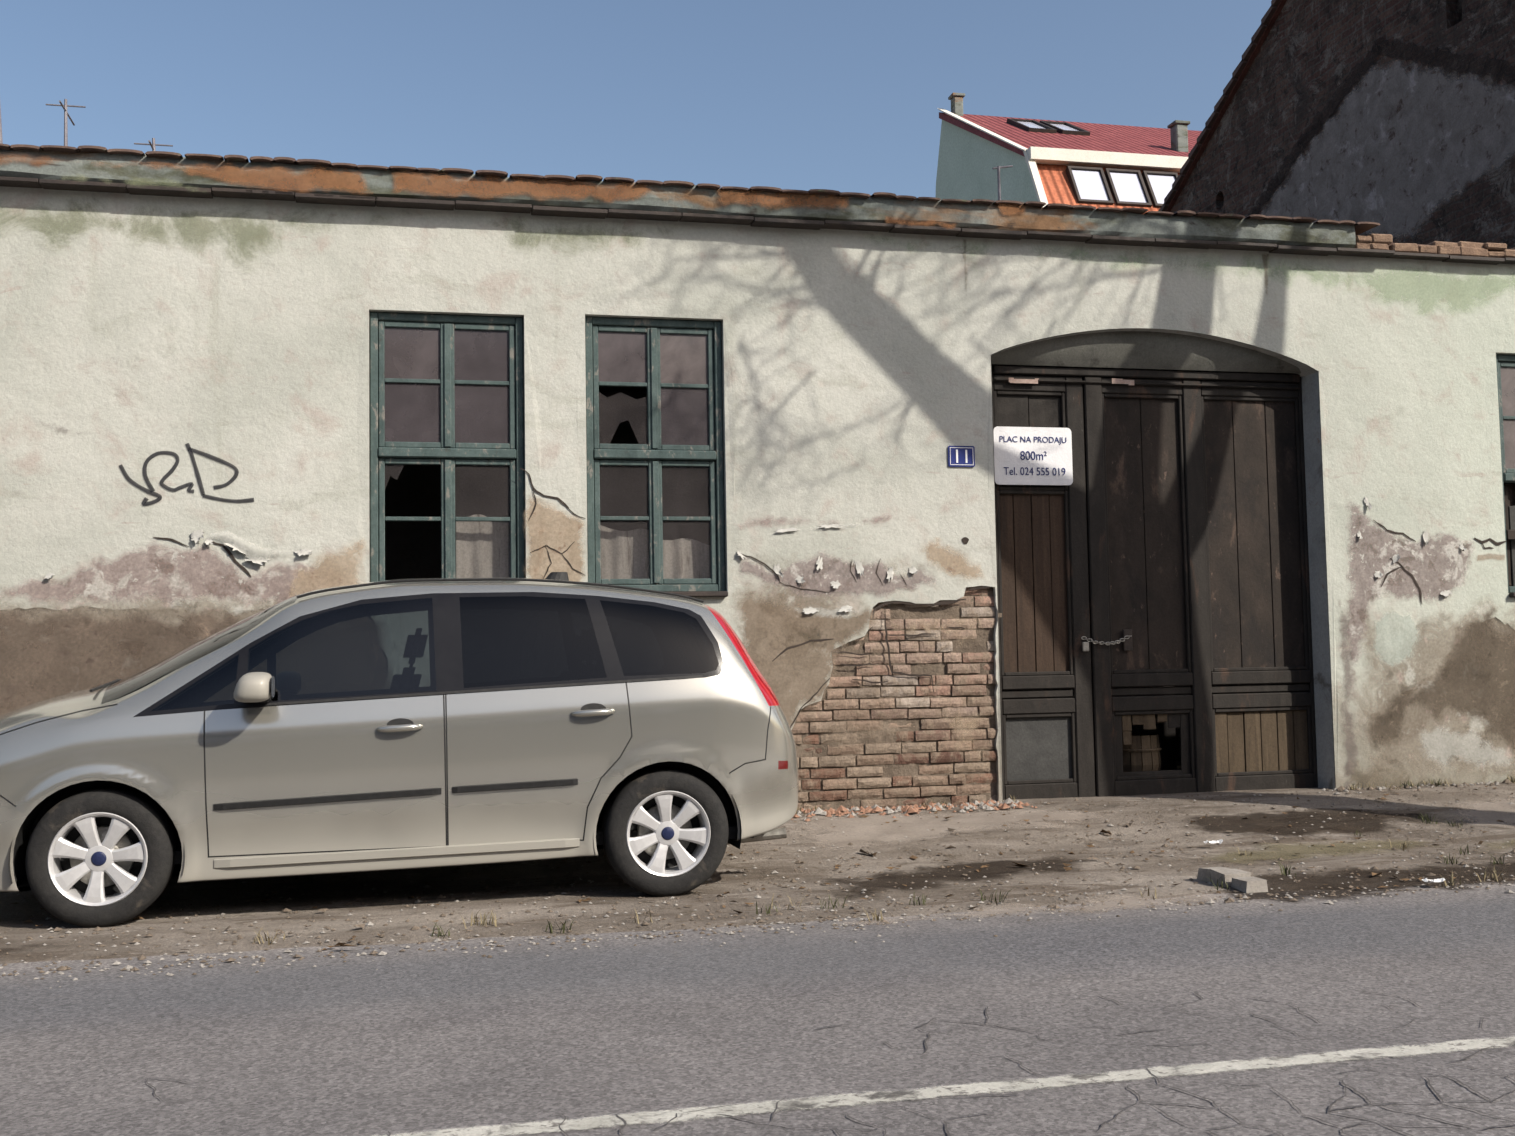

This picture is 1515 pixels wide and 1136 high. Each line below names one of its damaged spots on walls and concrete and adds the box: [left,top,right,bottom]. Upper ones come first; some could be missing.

crack [153,537,251,577]
crack [520,468,585,579]
peeling [527,501,583,581]
crack [1374,520,1422,604]
crack [1474,537,1507,549]
flaking render [0,528,363,716]
spalling [737,544,1002,811]
peeling [1347,497,1515,776]